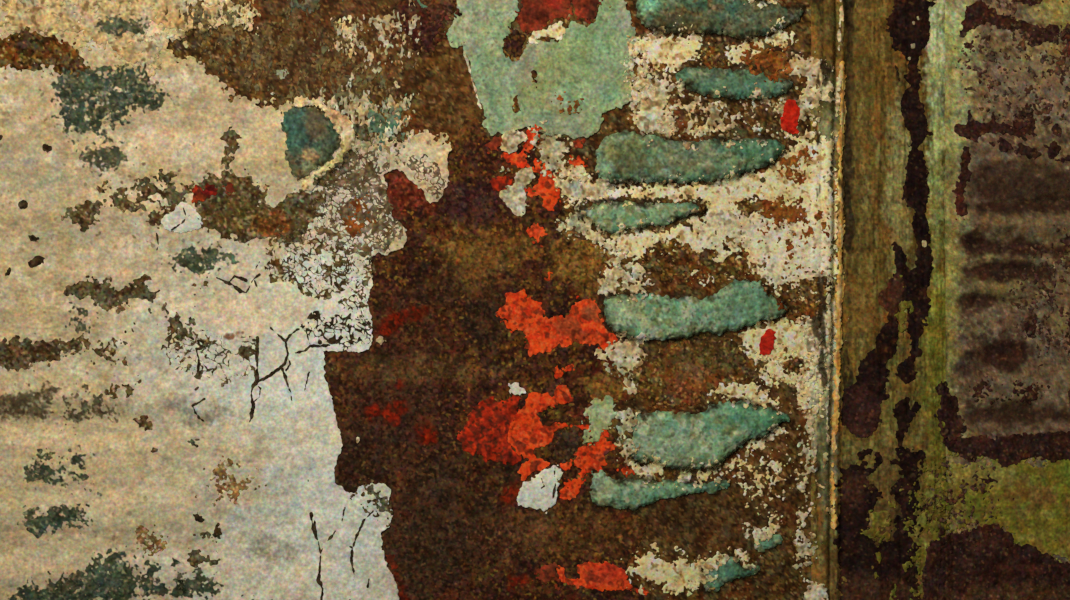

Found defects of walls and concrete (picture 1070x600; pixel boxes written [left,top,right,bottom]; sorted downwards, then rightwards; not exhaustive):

corrosion [551,91,594,115]
peeling [742,87,821,147]
peeling [161,202,203,233]
spalling [28,255,45,268]
damp [961,232,1068,283]
crack [161,148,446,422]
damp [958,294,997,309]
peeling [748,329,776,365]
damp [982,339,1028,372]
damp [964,402,1070,425]
corrosion [536,403,589,463]
corrosion [350,478,401,527]